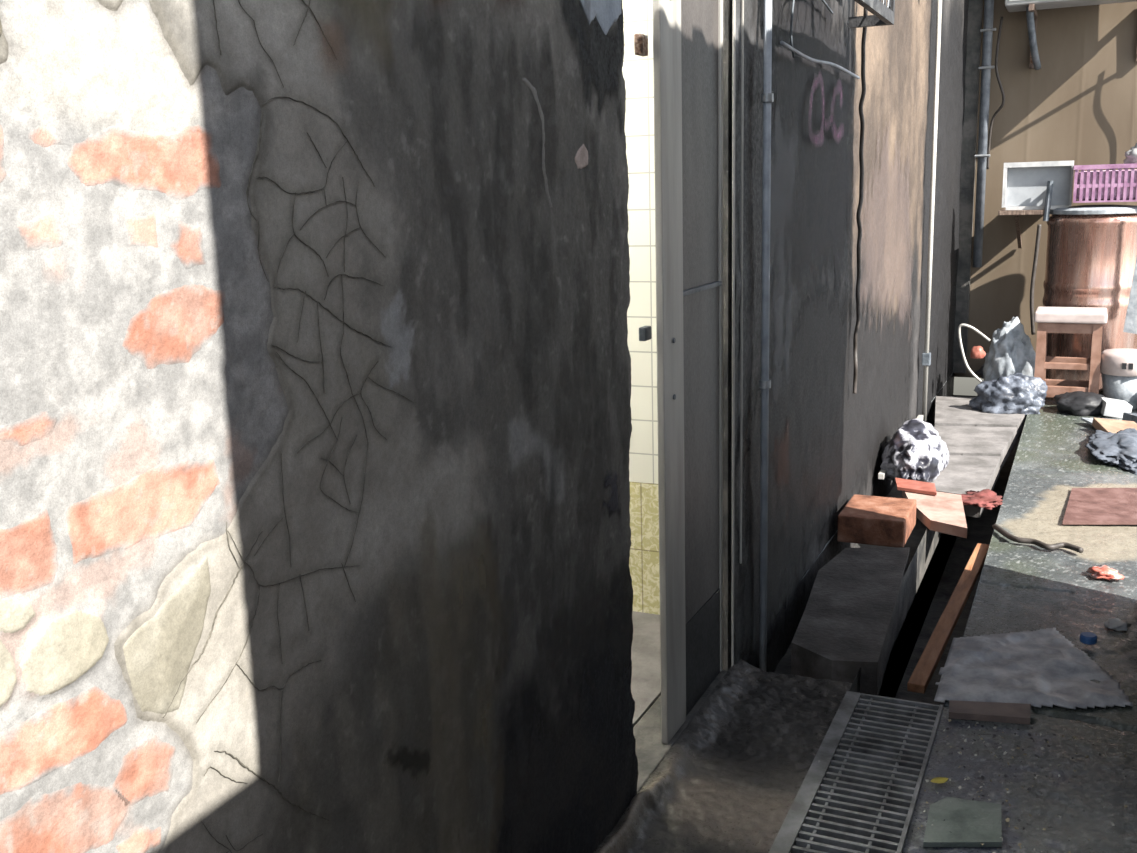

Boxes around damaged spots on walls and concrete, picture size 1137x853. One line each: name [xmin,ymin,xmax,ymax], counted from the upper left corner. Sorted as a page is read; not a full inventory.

spalling [0,0,289,853]
crack [163,0,412,821]